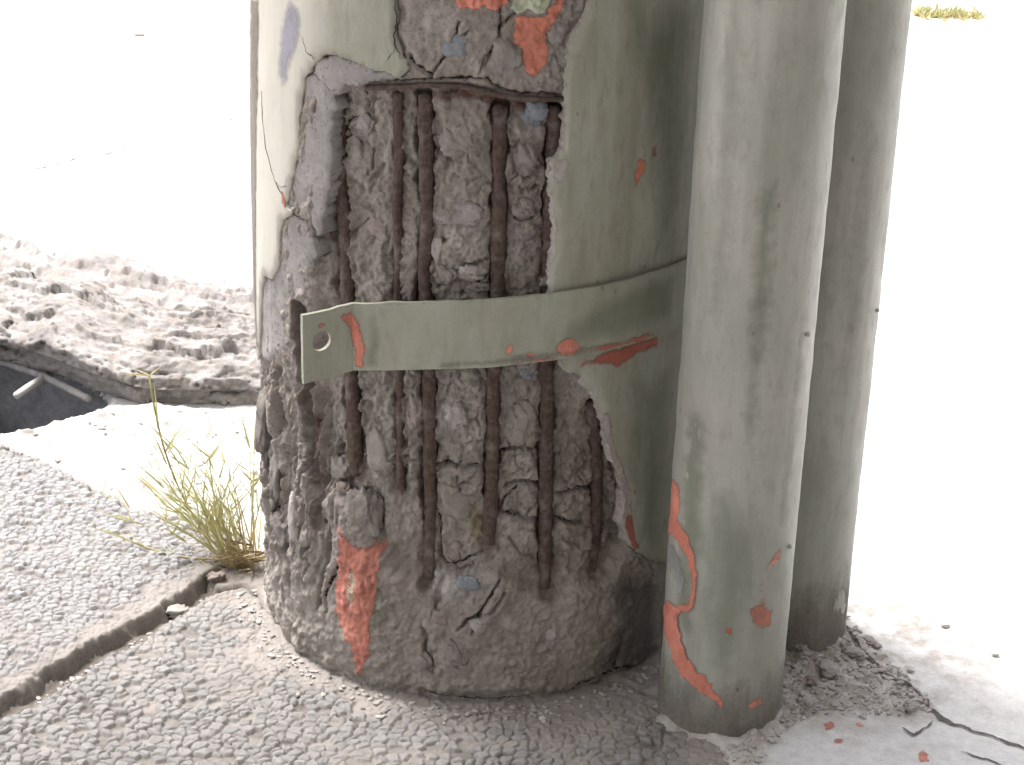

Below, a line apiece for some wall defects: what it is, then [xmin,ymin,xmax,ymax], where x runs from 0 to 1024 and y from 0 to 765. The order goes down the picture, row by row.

corrosion [435,90,526,110]
crack [261,91,310,228]
spalling [254,0,724,707]
crack [499,479,584,523]
crack [459,579,500,632]
peeling [750,591,772,628]
crack [846,625,1024,765]